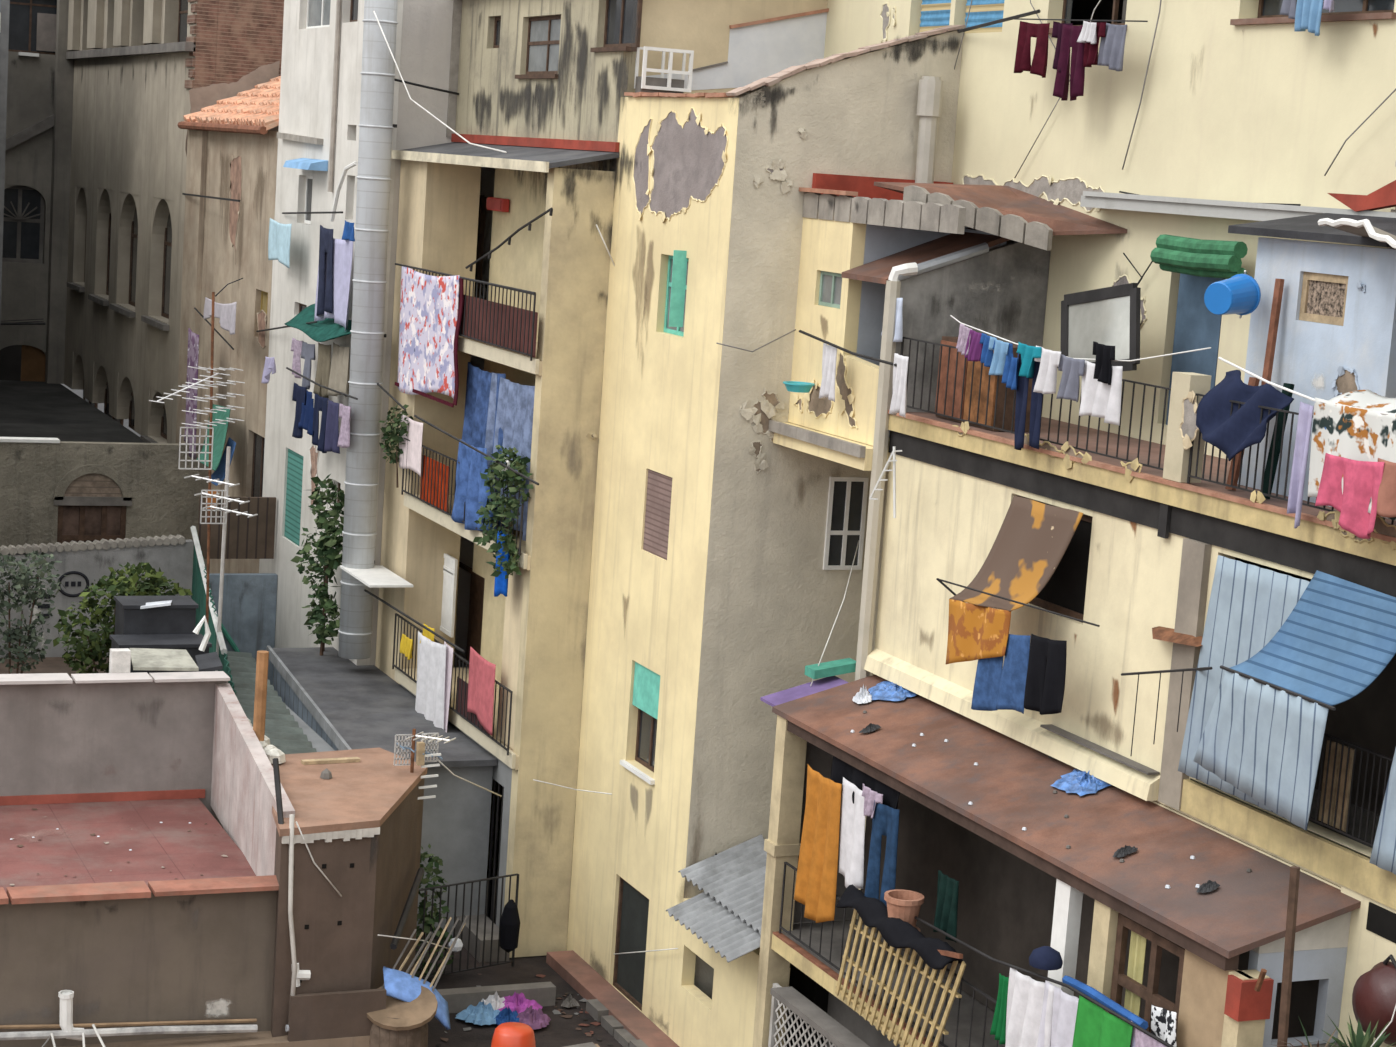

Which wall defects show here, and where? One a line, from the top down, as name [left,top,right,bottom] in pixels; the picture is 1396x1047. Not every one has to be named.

leakage [473,4,638,131]
peeling [632,107,728,222]